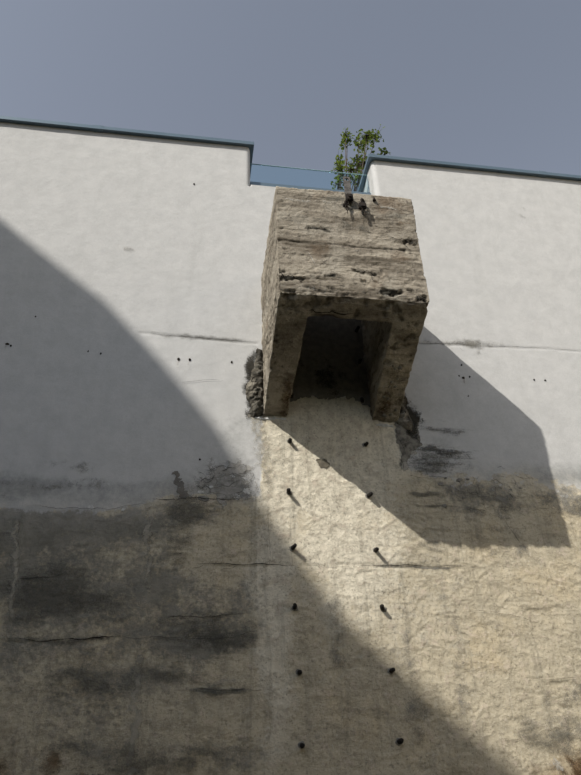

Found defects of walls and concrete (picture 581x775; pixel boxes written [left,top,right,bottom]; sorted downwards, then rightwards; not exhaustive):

spalling [242,348,264,418]
water stain [417,445,462,471]
spalling [394,393,534,516]
peeling [159,458,259,507]
crack [196,561,291,569]
crack [325,562,463,589]
crack [19,613,253,644]